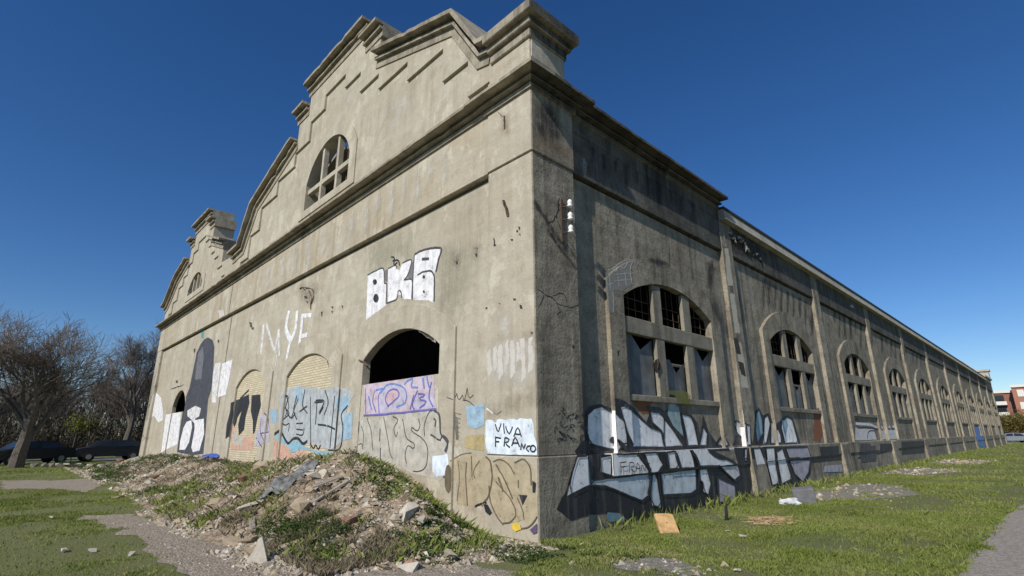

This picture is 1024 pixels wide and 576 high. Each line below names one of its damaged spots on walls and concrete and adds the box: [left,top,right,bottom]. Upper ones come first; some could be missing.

crack [538,289,578,315]